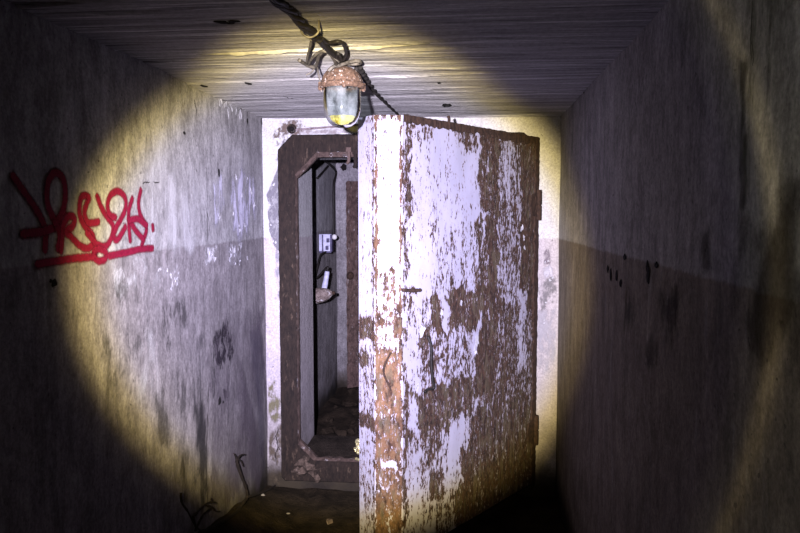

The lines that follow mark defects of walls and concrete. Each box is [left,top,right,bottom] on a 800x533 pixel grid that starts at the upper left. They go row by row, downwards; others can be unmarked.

leakage [213,321,233,375]